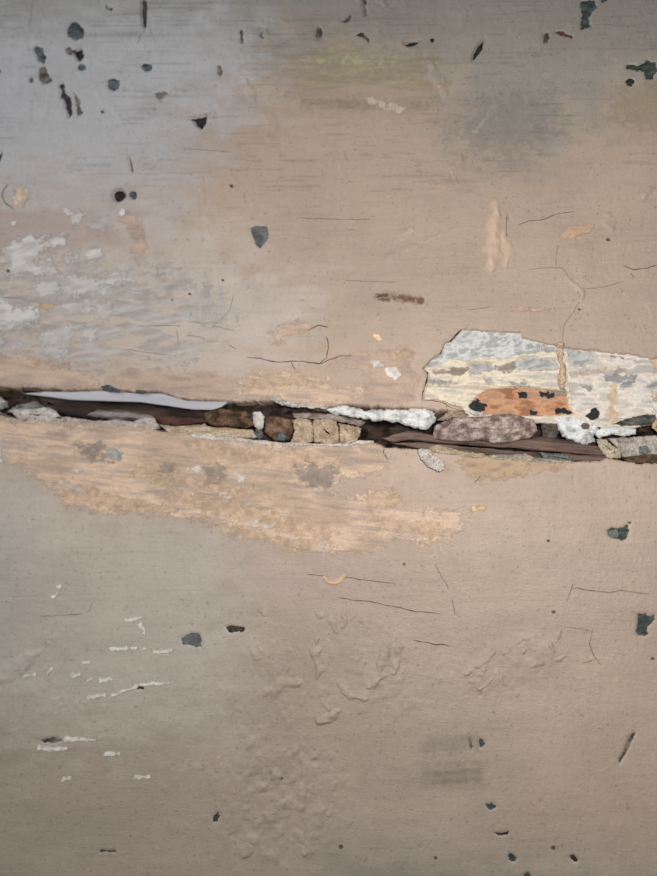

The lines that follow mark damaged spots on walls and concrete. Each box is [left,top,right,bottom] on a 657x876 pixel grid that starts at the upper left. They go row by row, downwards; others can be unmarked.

peeling [29,46,83,118]
peeling [65,22,86,71]
peeling [108,79,120,91]
peeling [114,191,148,258]
peeling [250,226,269,248]
peeling [0,207,136,392]
peeling [112,329,657,429]
crack [0,385,657,483]
peeling [0,417,486,557]